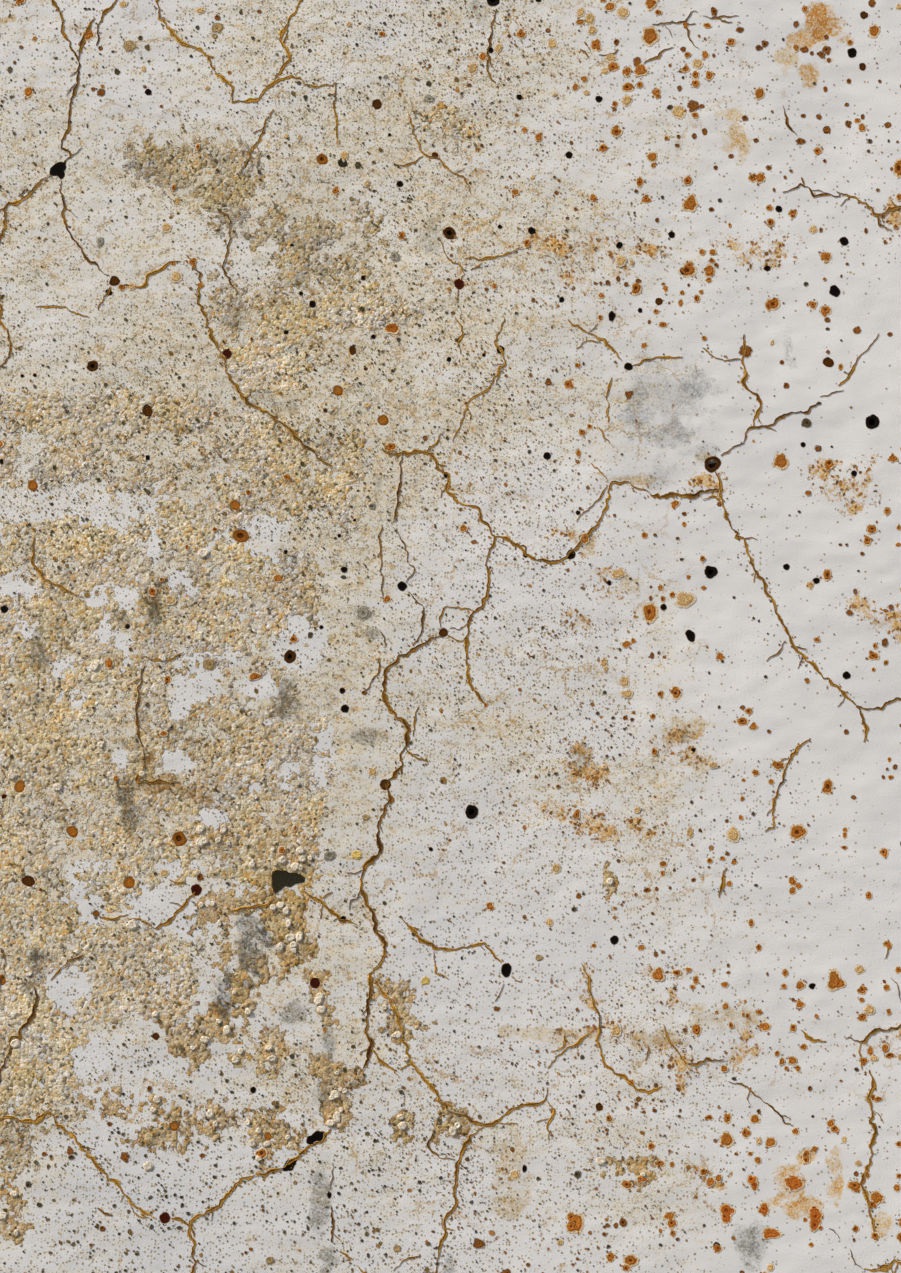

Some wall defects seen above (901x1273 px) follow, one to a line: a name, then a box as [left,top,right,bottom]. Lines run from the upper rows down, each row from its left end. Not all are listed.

crack [579,11,738,63]
corrosion [792,34,831,62]
crack [396,114,471,193]
corrosion [795,114,831,163]
corrosion [844,102,872,153]
crack [783,177,901,231]
crack [0,0,338,470]
crack [439,239,523,354]
crack [0,317,901,1273]
corrosion [774,968,819,1072]
corrosion [858,1040,901,1067]
corrosion [658,1207,680,1241]